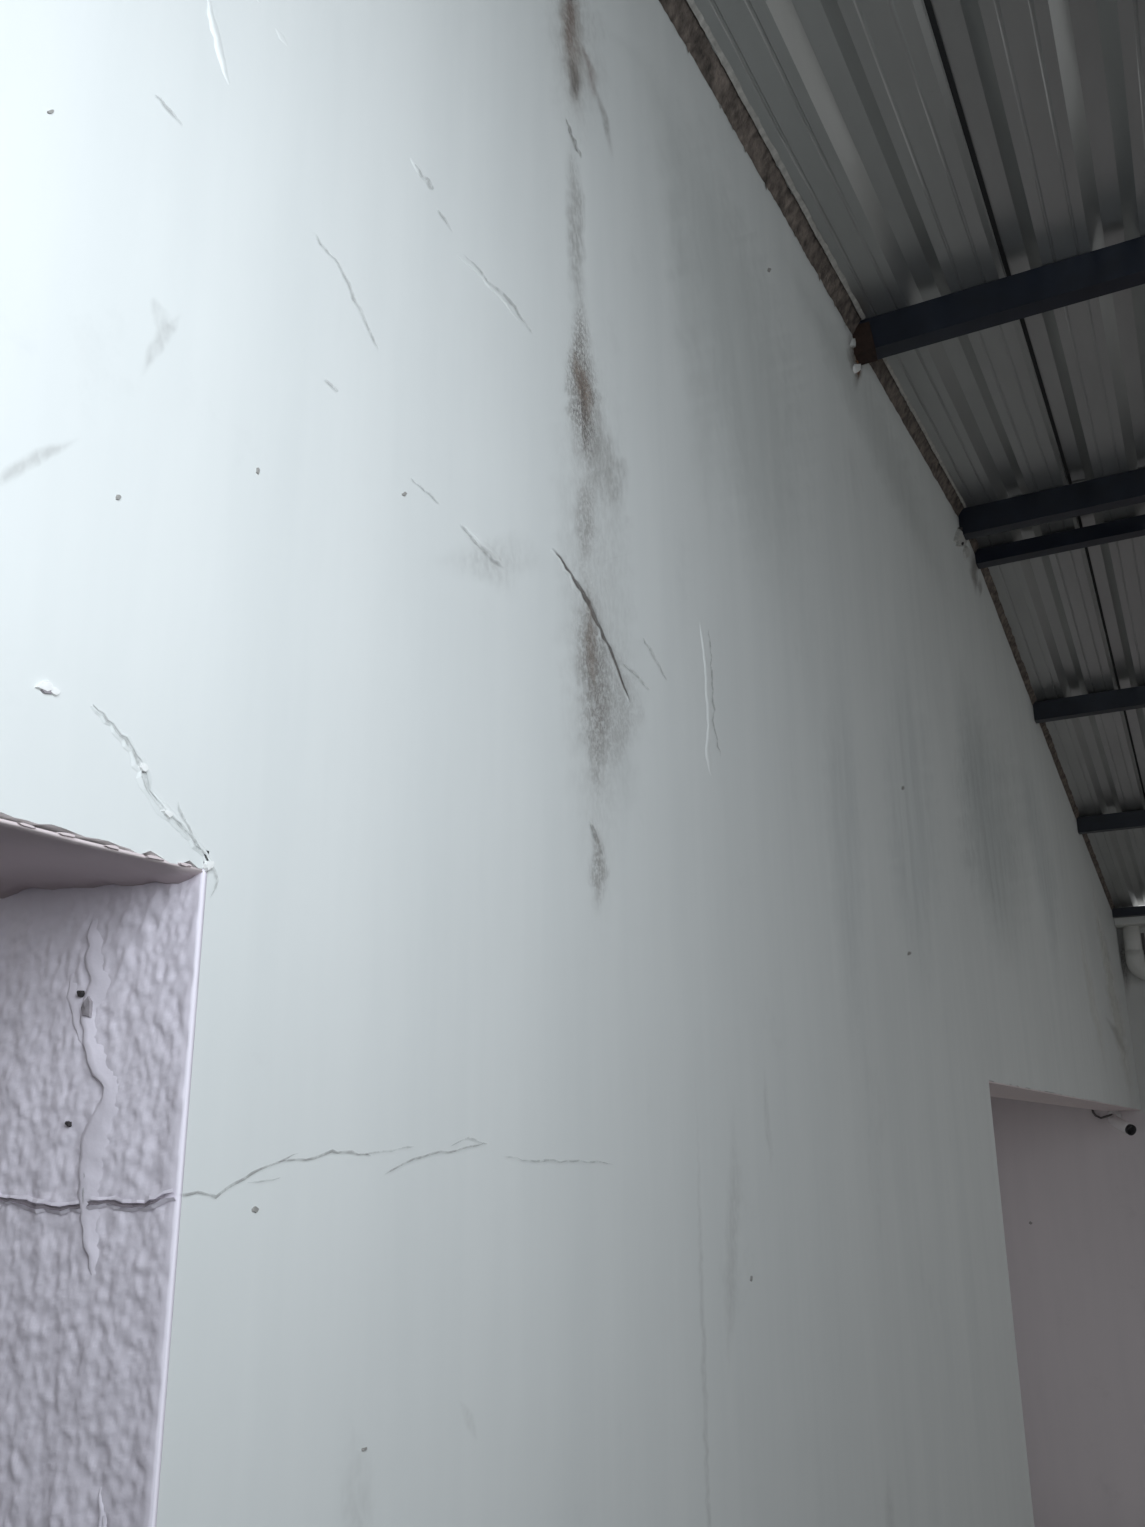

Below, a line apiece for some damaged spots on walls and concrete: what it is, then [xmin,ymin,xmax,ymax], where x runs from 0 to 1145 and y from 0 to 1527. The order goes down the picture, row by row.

damp [574,336,592,434]
crack [550,548,631,703]
crack [90,704,214,872]
crack [0,1189,176,1215]